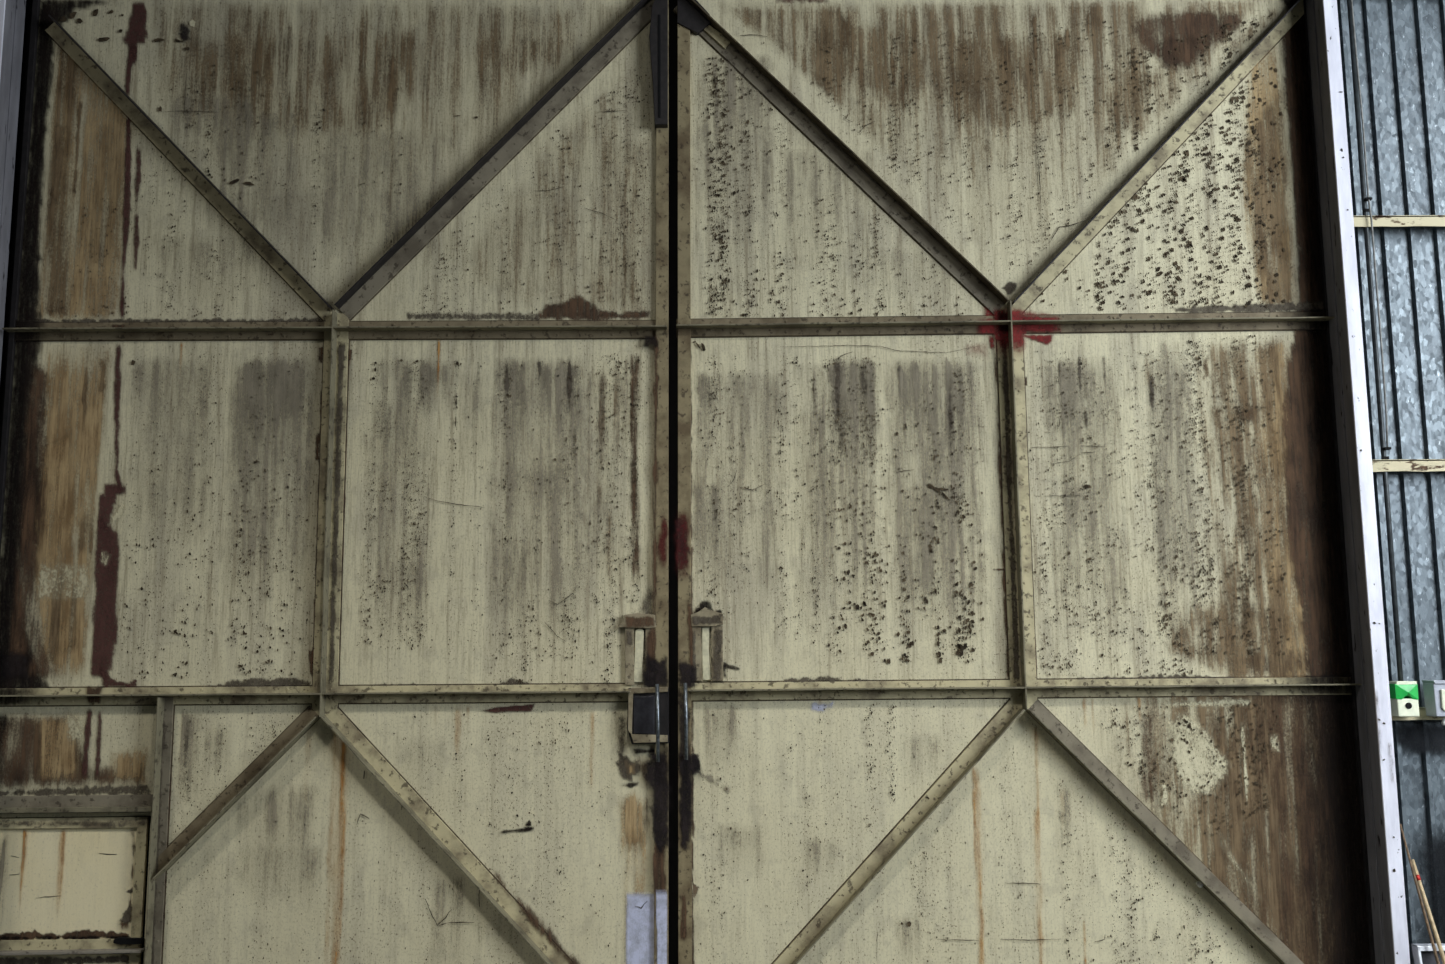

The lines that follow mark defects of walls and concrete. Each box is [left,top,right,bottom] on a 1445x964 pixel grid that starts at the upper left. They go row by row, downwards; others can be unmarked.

rust [407,141,649,321]
leakage [382,360,606,611]
rust [598,336,659,668]
leakage [698,375,752,479]
leakage [810,360,985,614]
rust [736,0,1370,964]